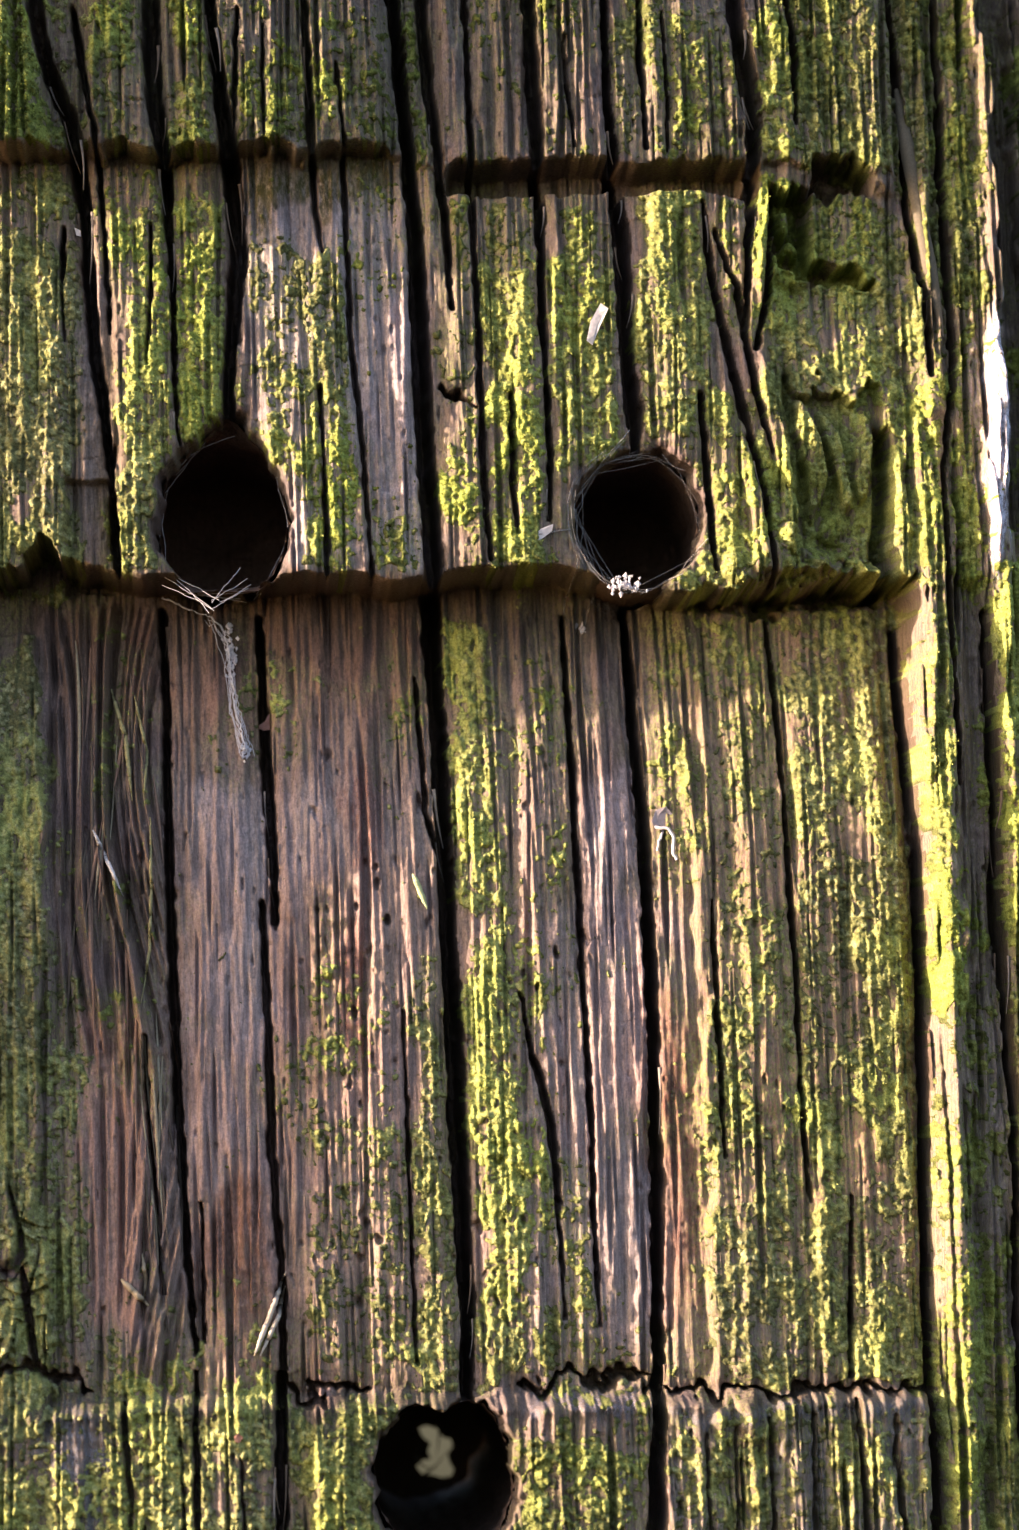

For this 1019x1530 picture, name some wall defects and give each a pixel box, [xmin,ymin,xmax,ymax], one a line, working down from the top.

crack [0,1265,146,1530]
water stain [51,1422,109,1480]
crack [144,609,208,1530]
crack [241,617,372,1530]
crack [383,0,670,1403]
water stain [530,1390,636,1419]
crack [516,609,943,1530]
crack [697,0,813,1203]
water stain [668,1398,926,1473]
crack [884,0,1019,1441]